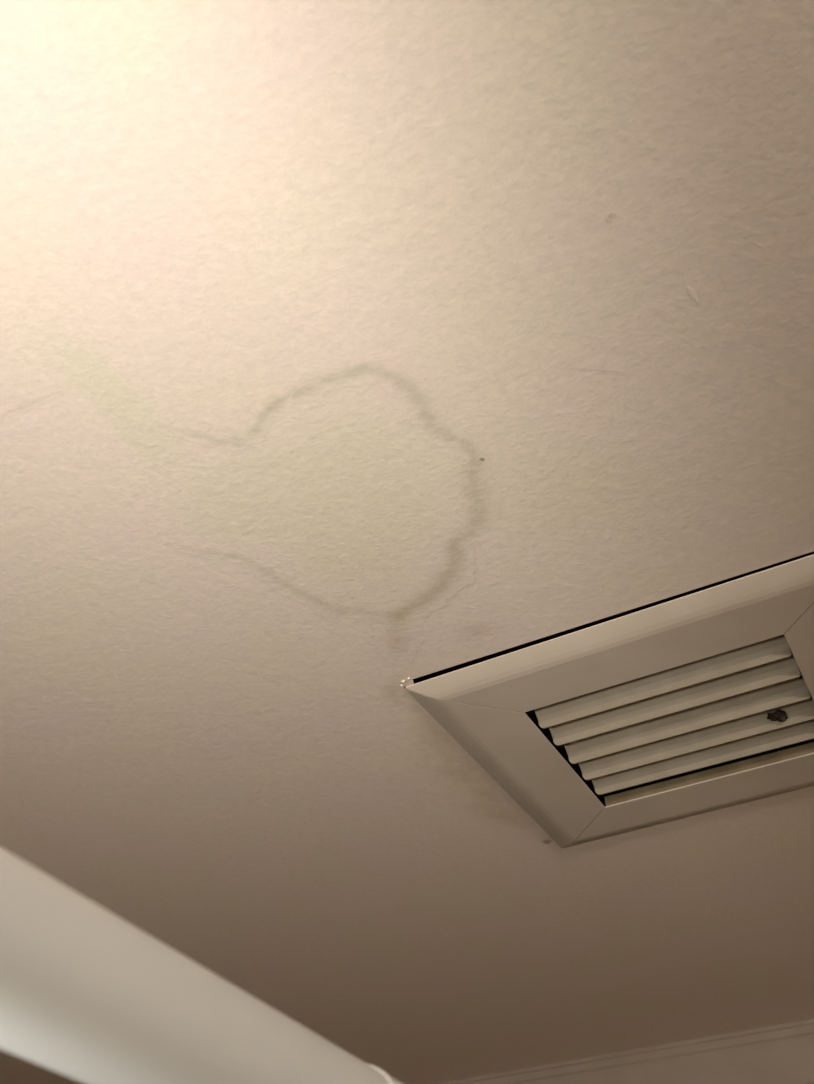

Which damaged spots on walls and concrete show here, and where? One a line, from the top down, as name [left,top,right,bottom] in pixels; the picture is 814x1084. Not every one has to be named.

leakage [0,287,708,848]